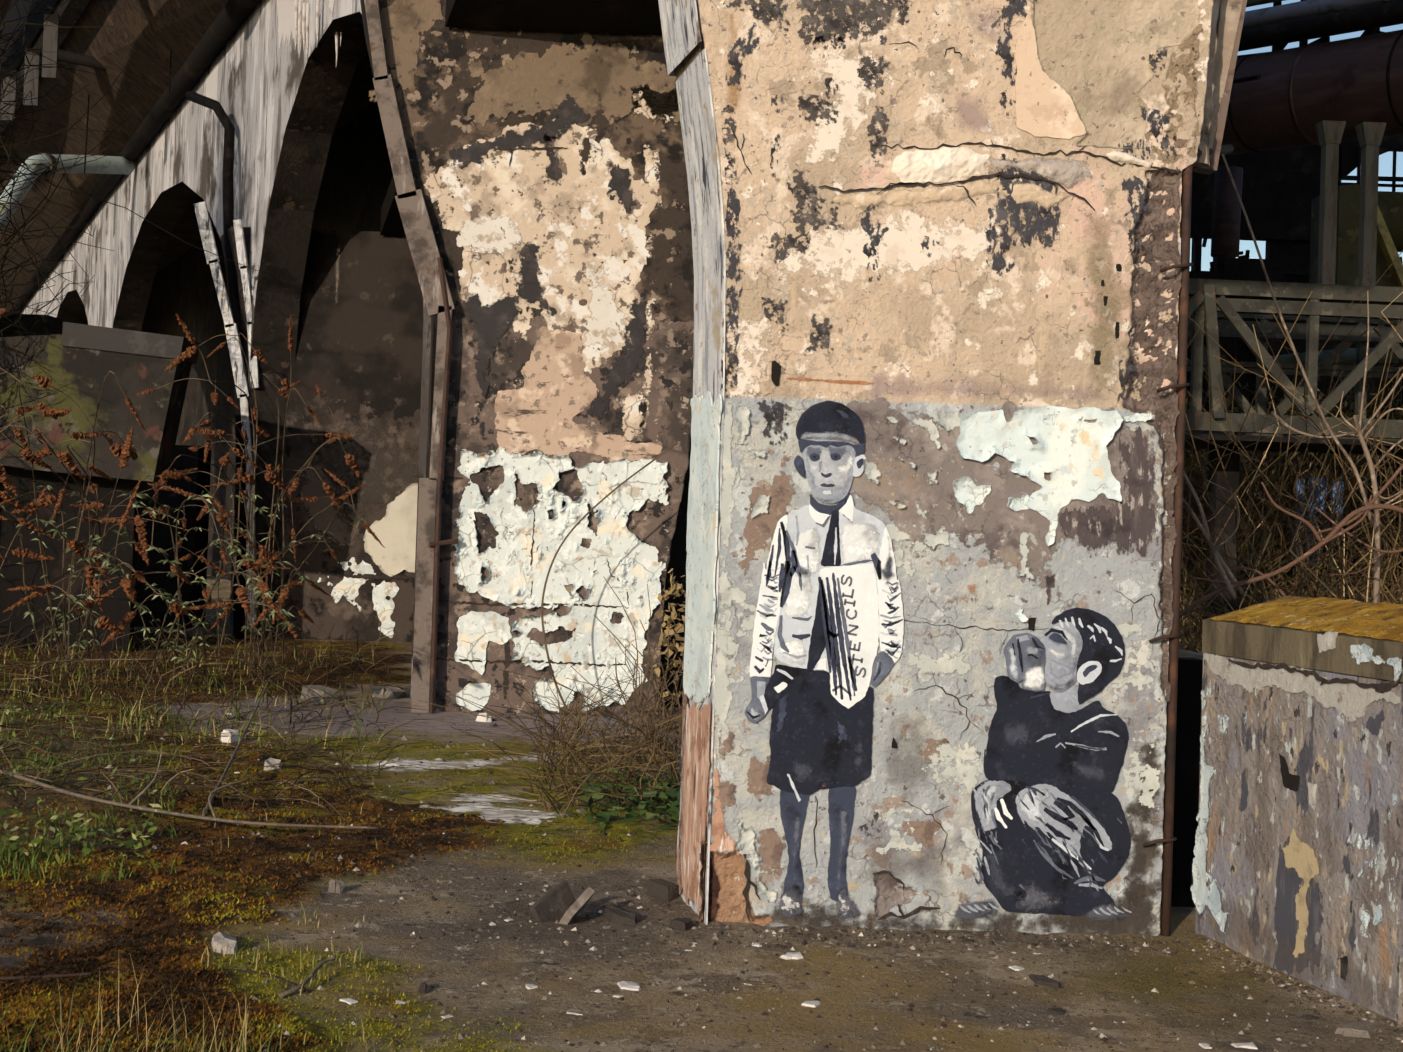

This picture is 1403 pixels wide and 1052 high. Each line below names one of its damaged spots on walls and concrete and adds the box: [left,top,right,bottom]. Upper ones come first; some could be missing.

damp [806,45,895,164]
damp [763,210,1001,285]
crack [819,140,1192,210]
peeling [424,32,680,713]
damp [728,312,771,402]
peeling [830,0,1202,702]
peeling [676,0,917,926]
peeling [298,455,418,638]
peeling [1317,632,1403,682]
peeling [1190,686,1229,933]
peeling [1282,828,1319,958]
peeling [1347,781,1401,938]